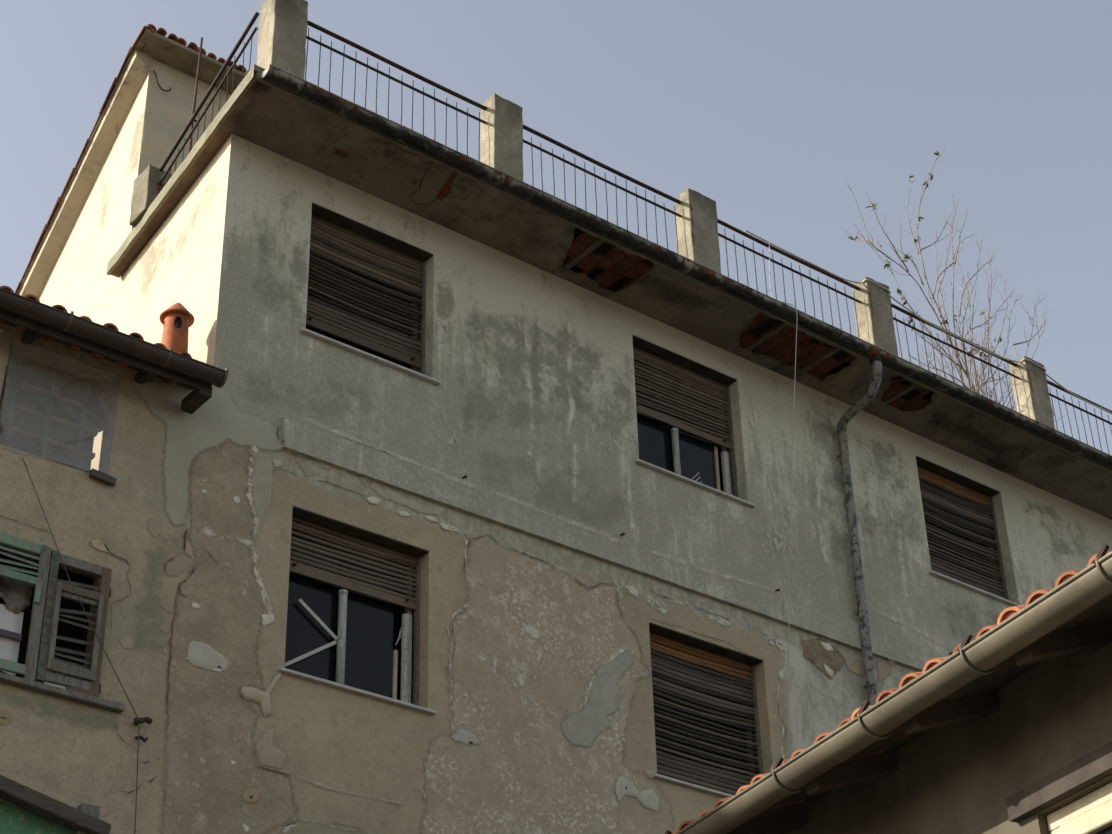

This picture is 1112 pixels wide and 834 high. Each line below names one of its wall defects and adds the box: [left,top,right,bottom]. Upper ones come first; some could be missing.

spalling [563,228,654,292]
spalling [739,314,856,380]
leakage [305,306,635,530]
spalling [881,376,934,411]
peeling [363,480,470,568]
crack [109,551,131,629]
flaking render [162,440,402,834]
peeling [626,585,730,626]
flaking render [802,637,864,679]